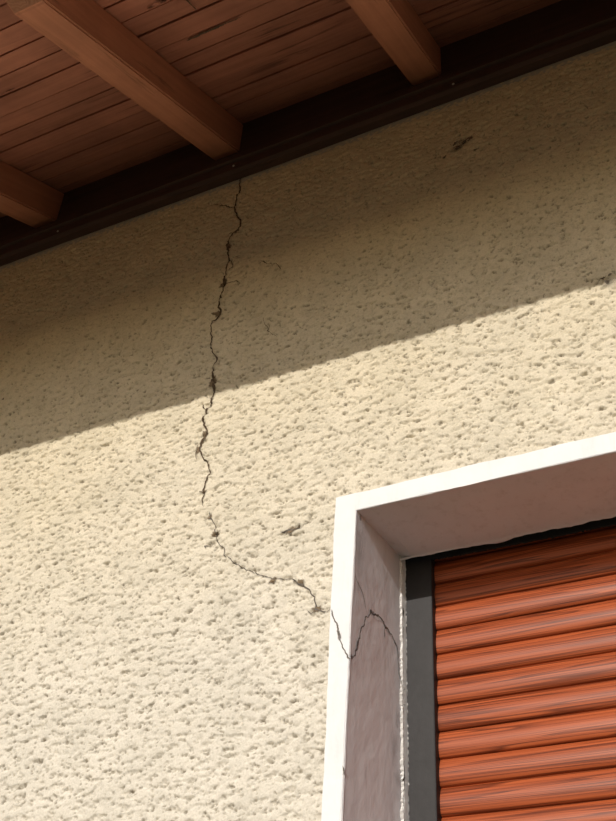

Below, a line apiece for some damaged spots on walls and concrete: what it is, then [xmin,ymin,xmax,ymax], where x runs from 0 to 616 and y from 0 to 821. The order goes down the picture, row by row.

crack [195,177,405,821]